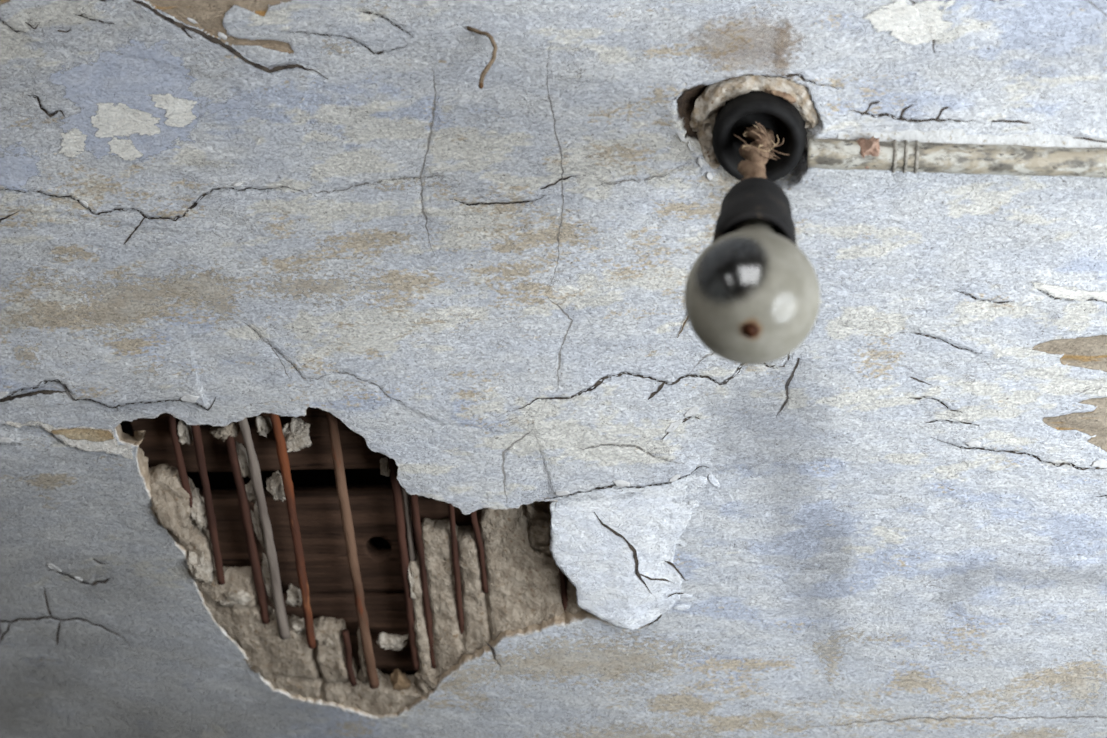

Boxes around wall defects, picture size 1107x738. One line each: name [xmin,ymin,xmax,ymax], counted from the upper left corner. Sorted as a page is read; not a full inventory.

crack [290,11,413,54]
peeling [862,0,956,45]
peeling [48,39,251,166]
flaking render [675,74,819,181]
crack [733,74,1031,124]
crack [0,44,800,500]
crack [903,332,976,353]
peeling [1032,335,1107,372]
crack [907,377,1107,470]
peeling [1042,397,1107,452]
crack [0,559,131,647]
flaking render [0,406,723,719]